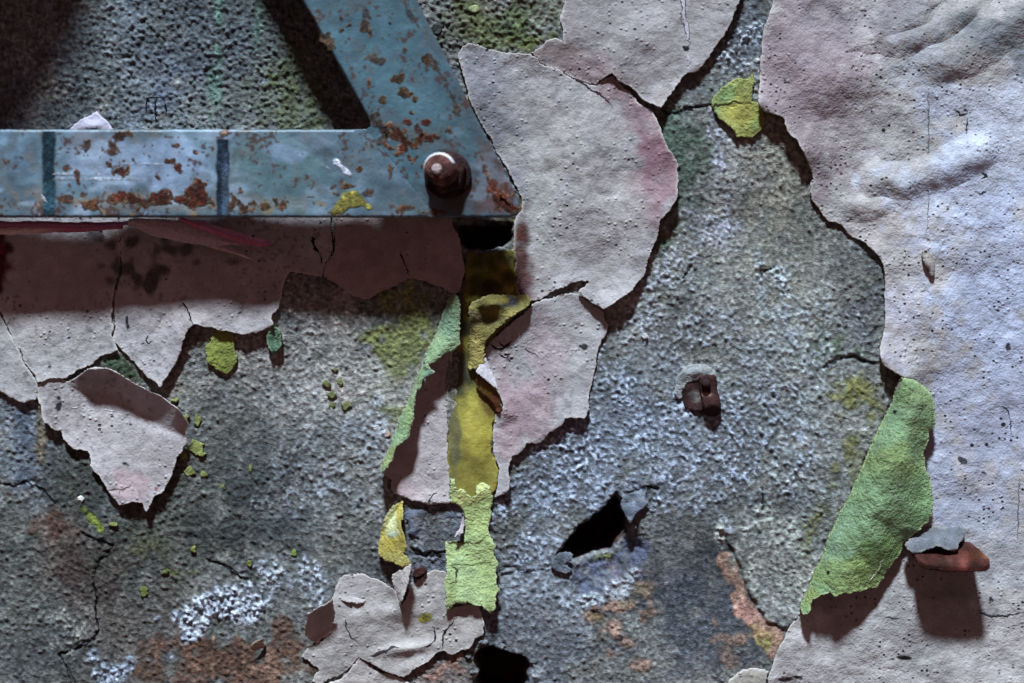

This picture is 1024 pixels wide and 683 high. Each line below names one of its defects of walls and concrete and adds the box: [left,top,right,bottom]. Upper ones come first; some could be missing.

rust [320,7,372,51]
rust [421,53,461,116]
rust [369,73,451,179]
rust [58,130,215,212]
rust [228,187,289,214]
rust [482,165,522,214]
crack [311,236,335,264]
peeling [0,0,740,683]
peeling [711,0,1024,683]
crack [5,481,57,505]
crack [58,531,114,683]
efflorescence [172,556,328,642]